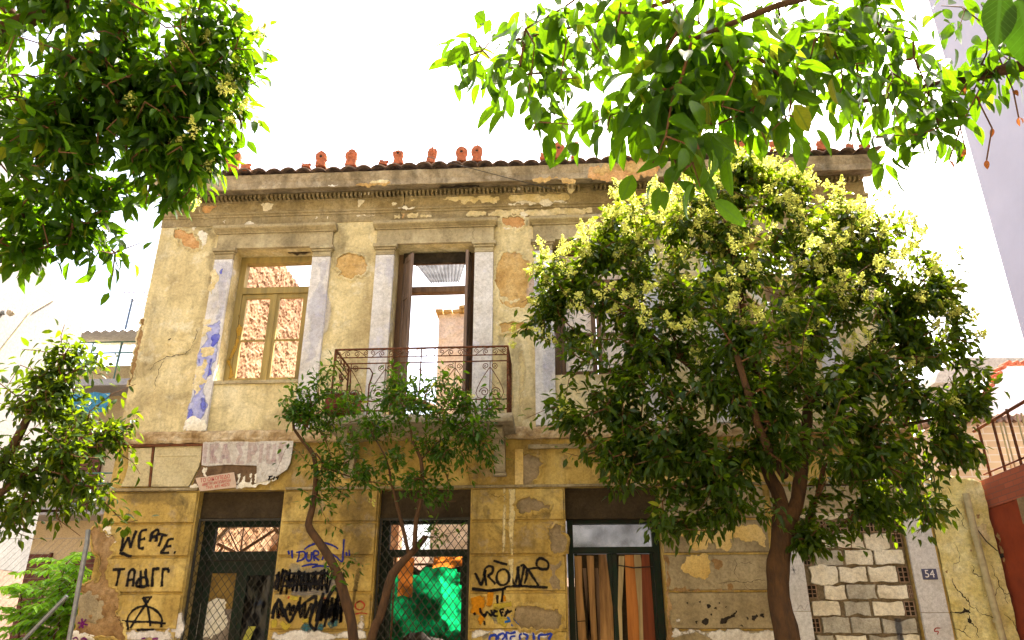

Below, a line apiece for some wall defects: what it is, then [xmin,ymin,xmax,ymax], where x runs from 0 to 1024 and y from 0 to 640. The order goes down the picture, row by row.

spalling [170,202,225,253]
spalling [332,251,370,284]
spalling [493,249,534,337]
spalling [444,158,660,232]
peeling [183,318,220,431]
spalling [72,523,228,640]
spalling [511,451,570,590]
peeling [663,524,774,640]
crack [950,513,1017,638]